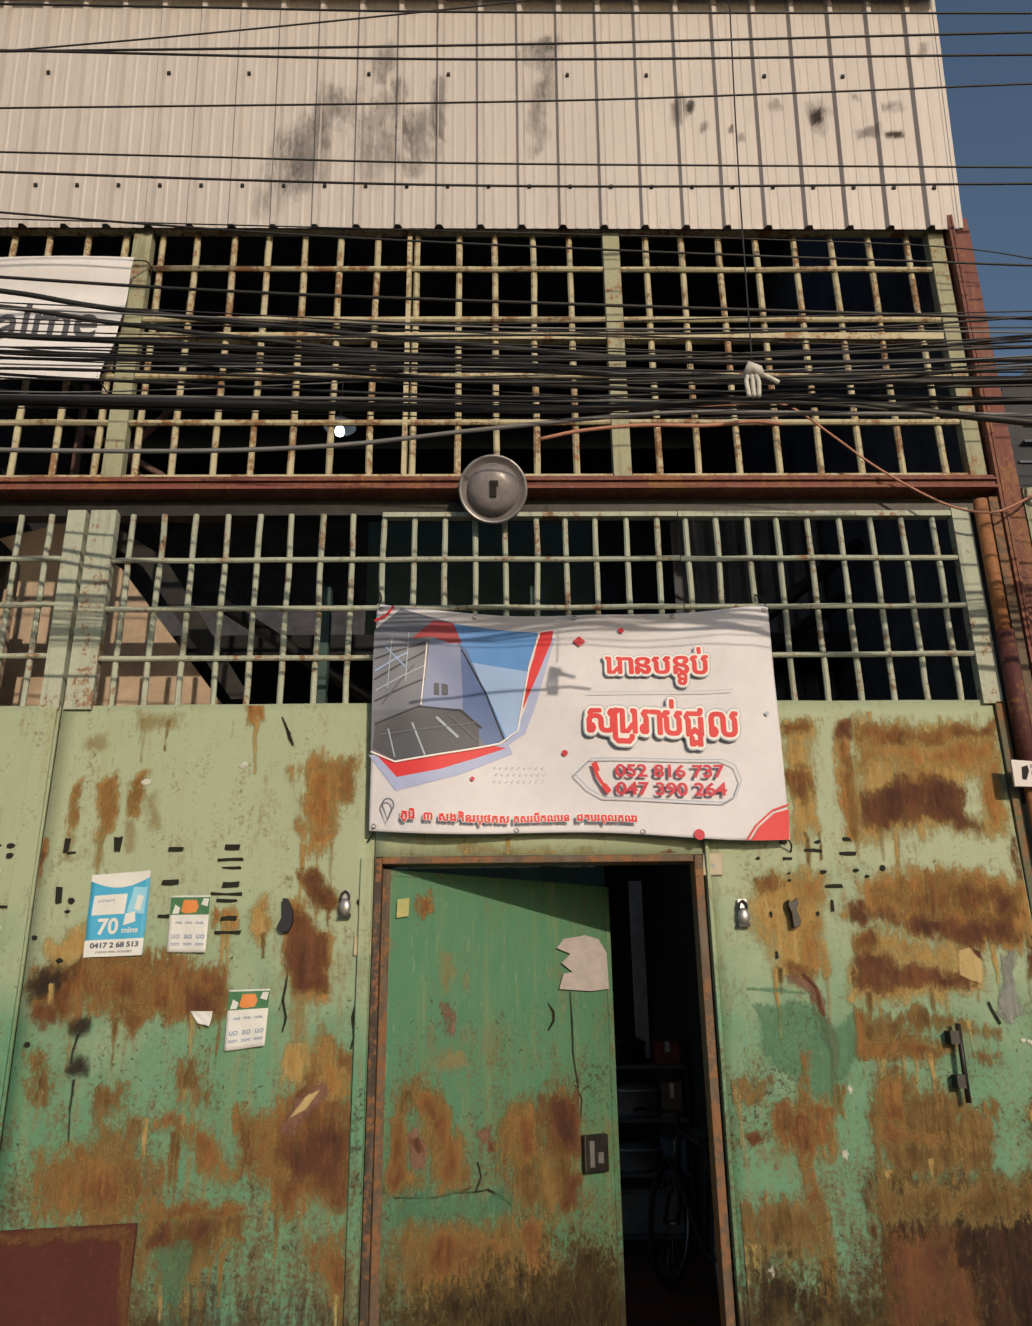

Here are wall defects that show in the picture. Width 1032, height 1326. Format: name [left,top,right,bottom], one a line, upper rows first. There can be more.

corrosion [0,746,361,1326]
corrosion [244,705,265,774]
corrosion [731,712,1032,1326]